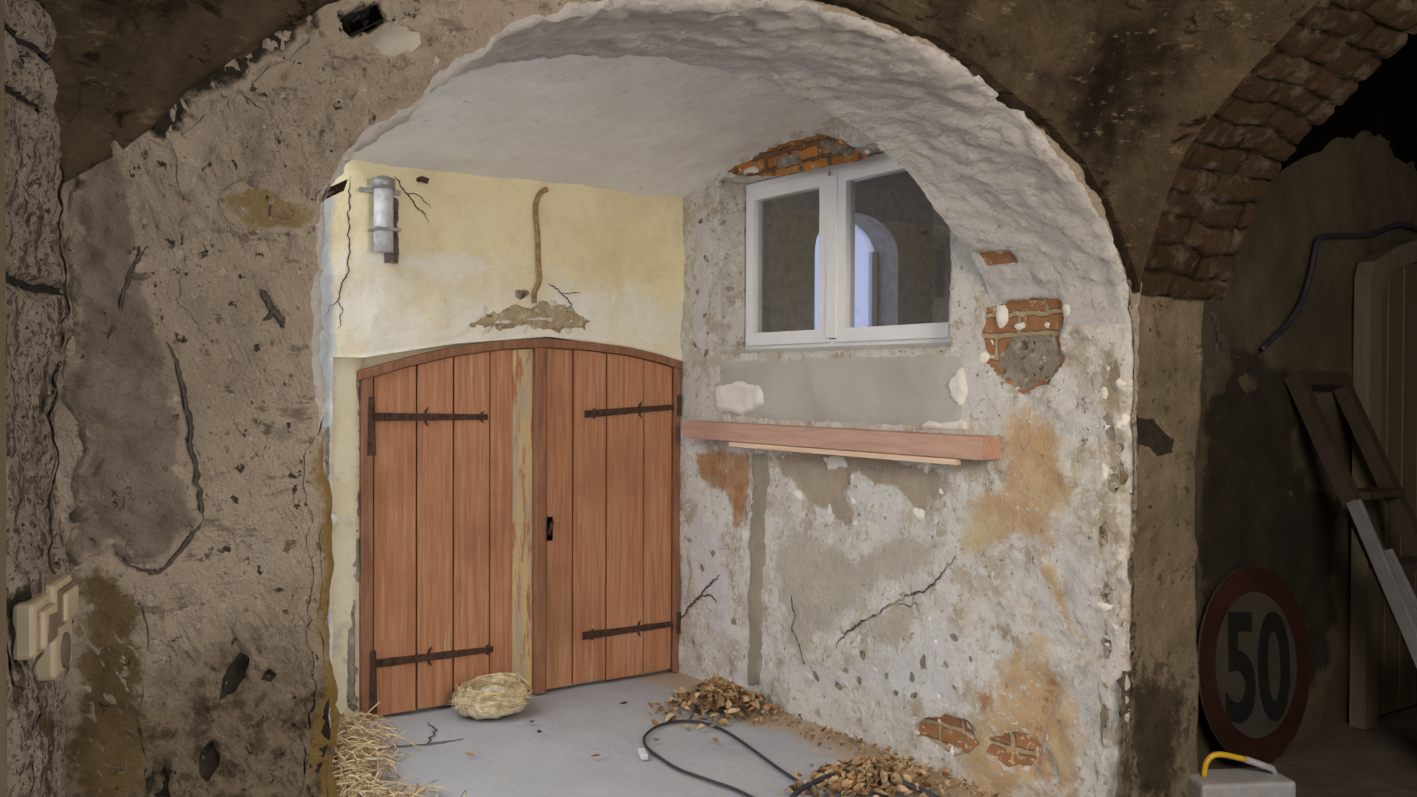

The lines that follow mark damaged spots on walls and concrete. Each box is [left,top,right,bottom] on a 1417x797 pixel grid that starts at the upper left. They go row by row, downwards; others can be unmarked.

flaking render [727,134,870,177]
peeling [61,140,205,574]
flaking render [469,290,590,335]
flaking render [977,297,1070,394]
damp [30,547,182,797]
flaking render [322,426,330,481]
flaking render [304,599,359,793]
crack [791,597,804,662]
crack [836,556,956,648]
peeling [772,604,1042,767]
damp [767,392,1102,797]
flaking render [1089,336,1174,732]